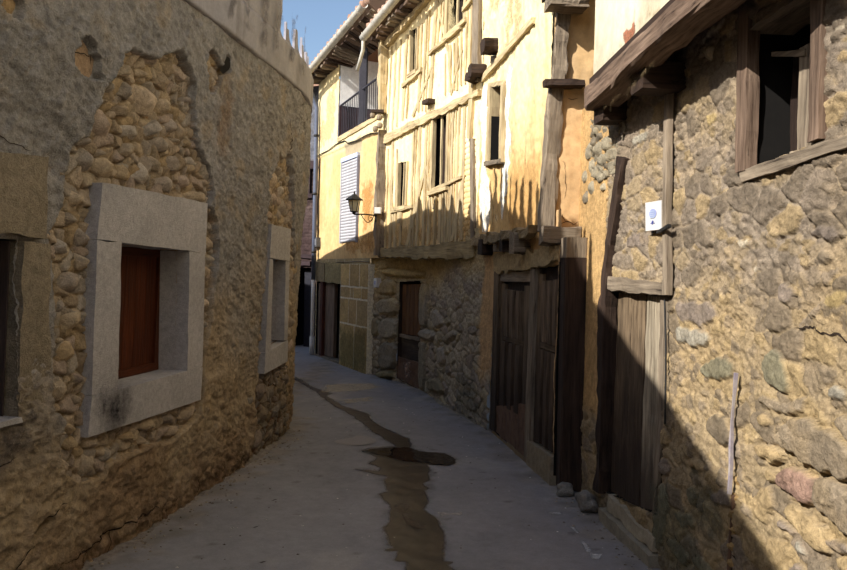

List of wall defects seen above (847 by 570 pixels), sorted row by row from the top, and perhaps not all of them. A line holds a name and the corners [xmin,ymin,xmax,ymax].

spalling [207,56,230,89]
spalling [47,52,215,487]
spalling [267,159,298,352]
spalling [245,289,289,464]
crack [62,506,160,564]